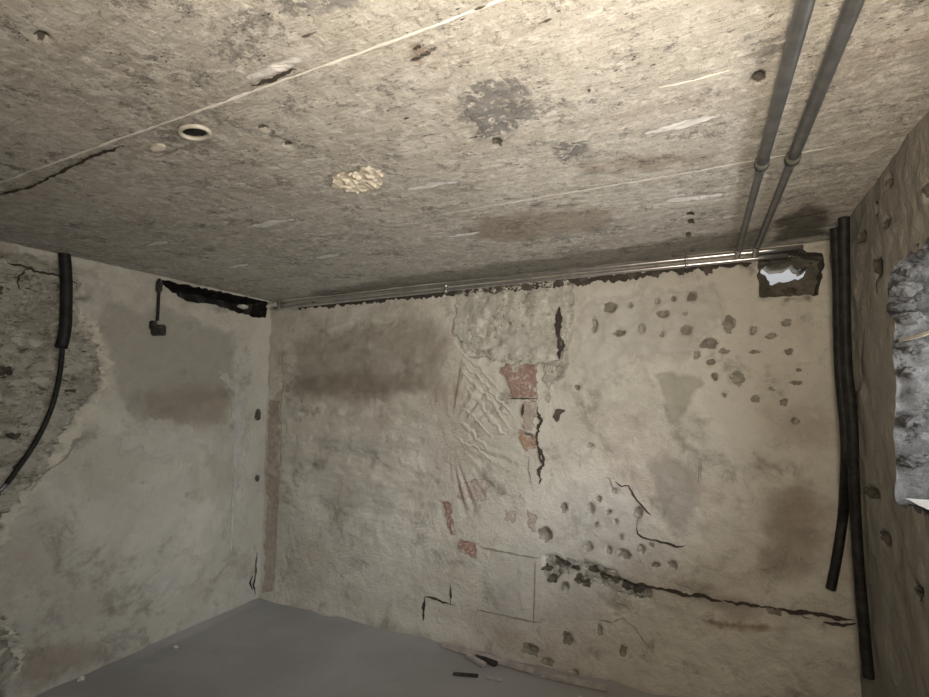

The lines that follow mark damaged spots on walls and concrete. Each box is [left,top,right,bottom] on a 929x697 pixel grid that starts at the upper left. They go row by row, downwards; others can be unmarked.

water stain [460,80,529,138]
crack [0,145,124,195]
crack [154,140,224,158]
spalling [887,237,929,325]
spalling [592,302,617,333]
spalling [722,315,736,334]
spalling [694,338,730,381]
flaking render [0,253,114,558]
crack [521,404,545,485]
flaking render [443,479,489,558]
crack [607,477,685,548]
crack [618,576,856,627]